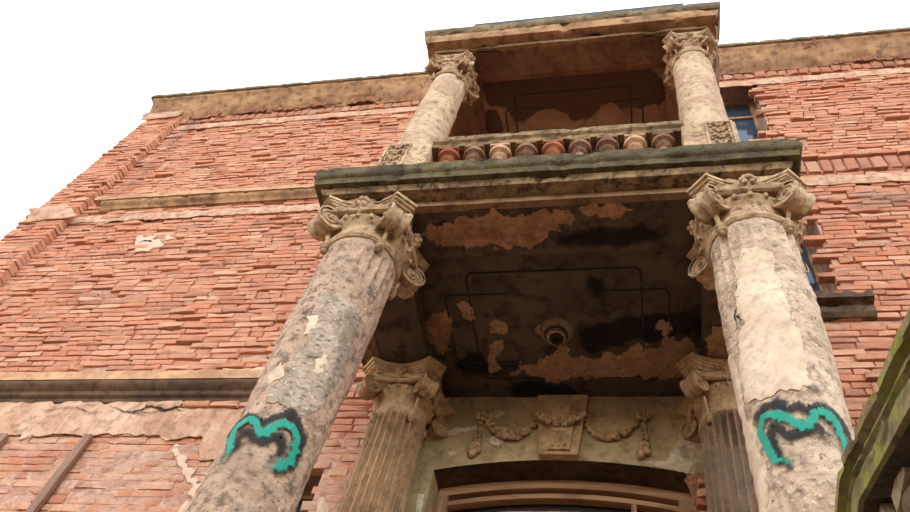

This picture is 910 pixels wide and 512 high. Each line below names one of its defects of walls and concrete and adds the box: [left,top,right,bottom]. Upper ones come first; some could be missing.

peeling [420,203,633,252]
peeling [425,301,475,355]
spalling [250,290,360,416]
flaking render [487,246,812,512]
crack [41,400,185,414]
flaking render [153,401,248,410]
spalling [778,467,837,512]